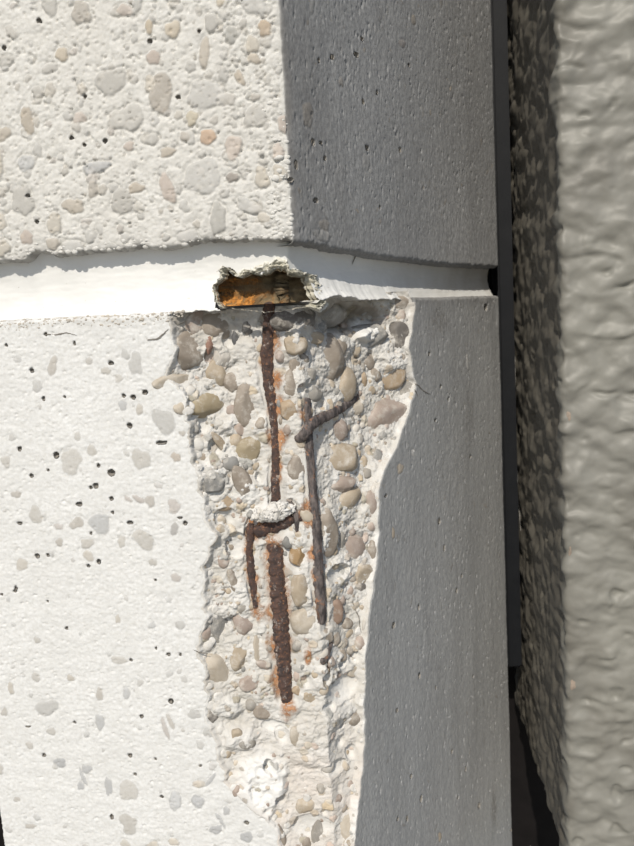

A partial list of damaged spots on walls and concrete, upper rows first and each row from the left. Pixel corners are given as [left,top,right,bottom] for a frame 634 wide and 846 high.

spalling [0,291,417,846]
rust [214,278,260,306]